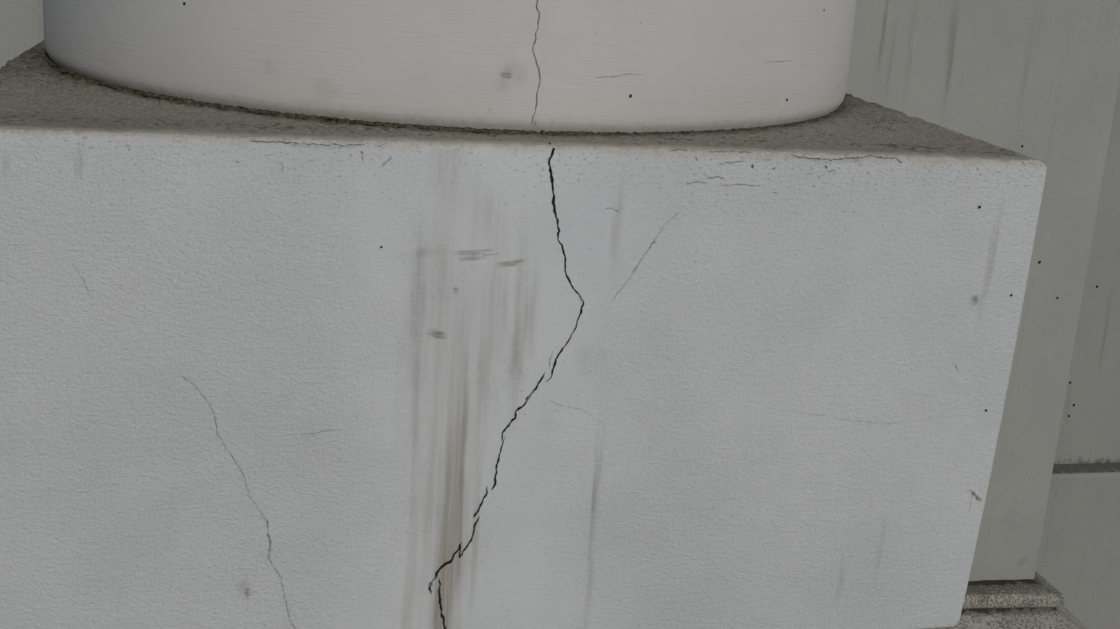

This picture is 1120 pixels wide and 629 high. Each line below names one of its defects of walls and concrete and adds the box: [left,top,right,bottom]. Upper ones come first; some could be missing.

crack [427,0,584,629]